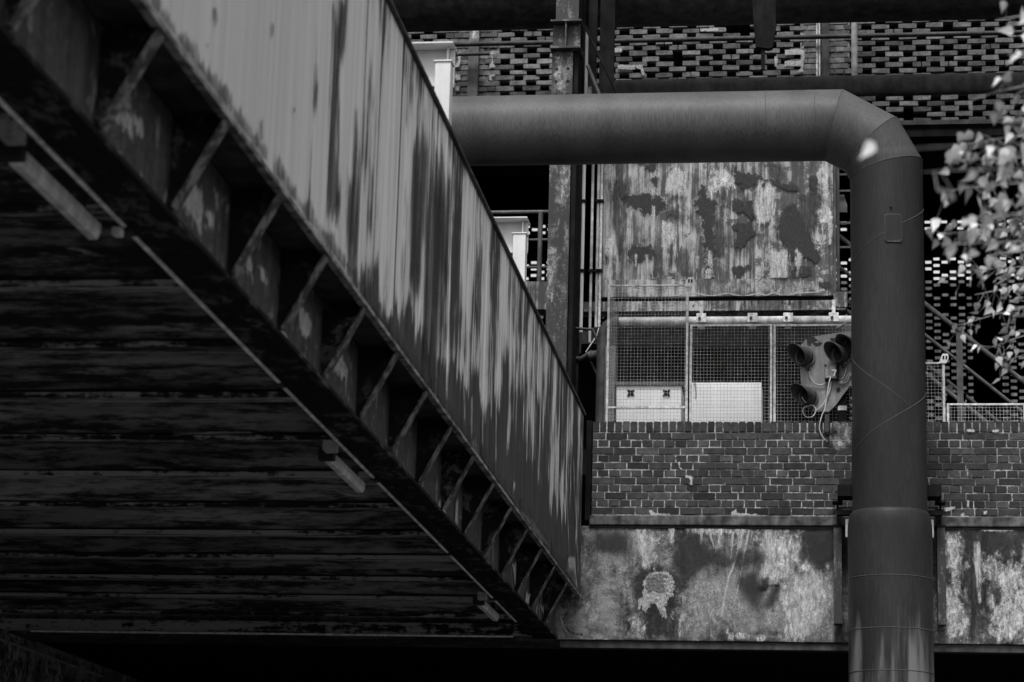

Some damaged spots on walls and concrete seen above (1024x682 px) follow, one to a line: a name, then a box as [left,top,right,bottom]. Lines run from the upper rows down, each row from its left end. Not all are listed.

damp [326,0,362,284]
peeling [618,164,679,223]
peeling [627,243,681,279]
rust [653,234,689,276]
peeling [692,163,833,291]
spalling [638,571,675,618]
damp [567,498,834,642]
damp [936,530,1024,644]